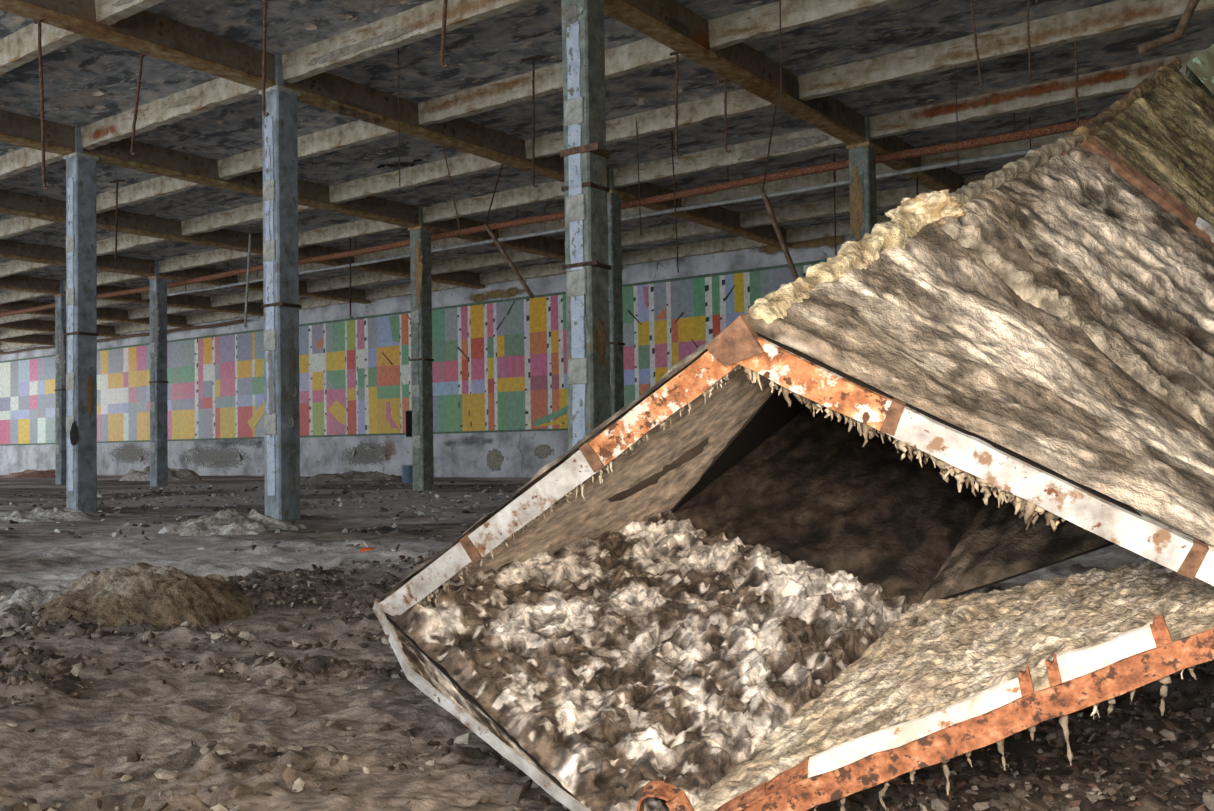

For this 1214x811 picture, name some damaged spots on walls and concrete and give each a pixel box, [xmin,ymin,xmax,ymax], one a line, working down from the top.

corrosion [914,68,1148,117]